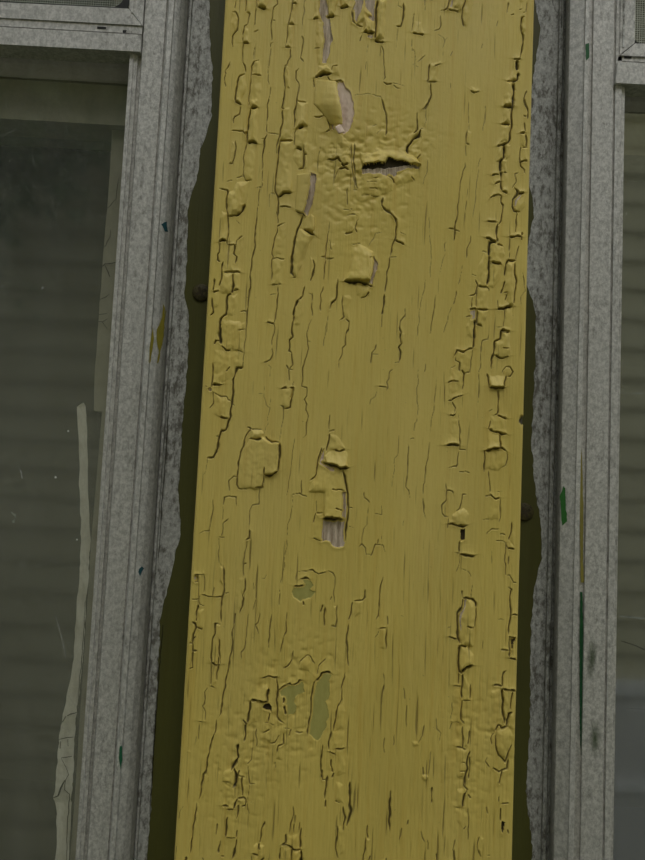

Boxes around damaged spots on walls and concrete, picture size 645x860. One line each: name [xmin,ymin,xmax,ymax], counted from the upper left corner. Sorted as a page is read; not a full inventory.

peeling [267,0,387,279]
peeling [359,149,422,198]
peeling [342,245,378,300]
peeling [308,413,355,547]
crack [174,0,491,860]
crack [485,520,519,584]
peeling [433,588,485,860]
peeling [484,584,518,785]
crack [497,778,511,836]